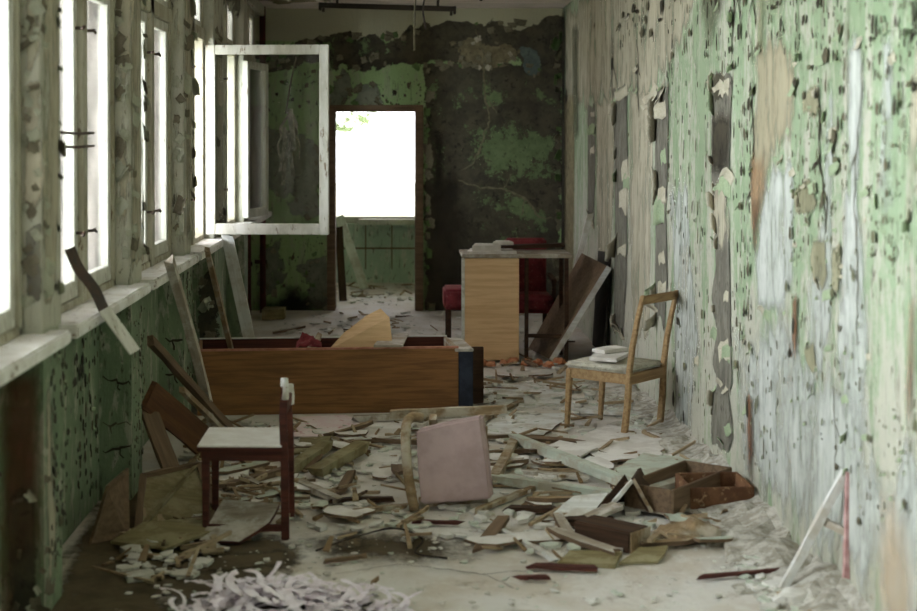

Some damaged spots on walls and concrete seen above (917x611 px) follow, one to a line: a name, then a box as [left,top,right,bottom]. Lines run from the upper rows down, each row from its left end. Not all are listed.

peeling [20,0,66,309]
peeling [115,0,150,271]
peeling [171,0,200,240]
peeling [214,26,227,223]
peeling [223,0,334,19]
leakage [425,133,462,309]
peeling [256,0,917,611]
flaking render [8,328,99,611]